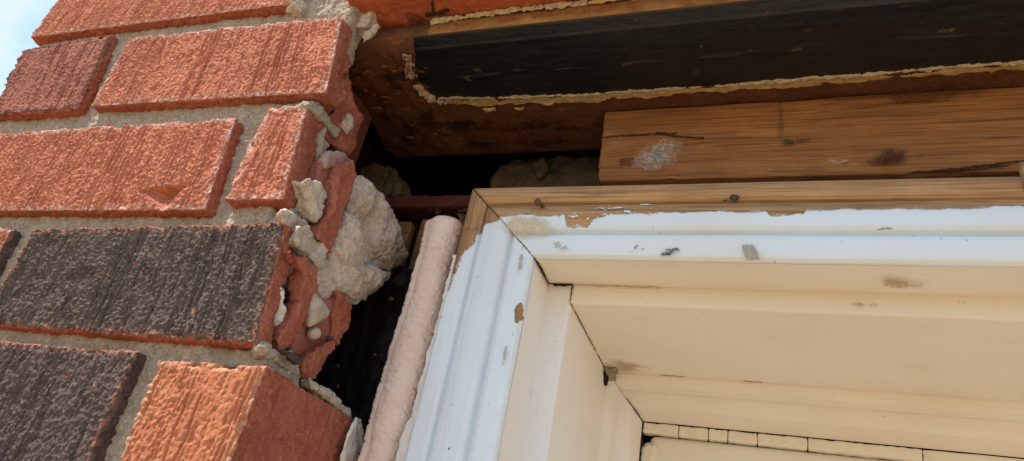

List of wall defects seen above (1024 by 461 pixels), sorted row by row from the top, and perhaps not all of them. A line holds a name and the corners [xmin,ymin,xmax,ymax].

spalling [195,72,409,417]
spalling [356,11,381,39]
crack [601,131,704,139]
peeling [395,204,1024,461]